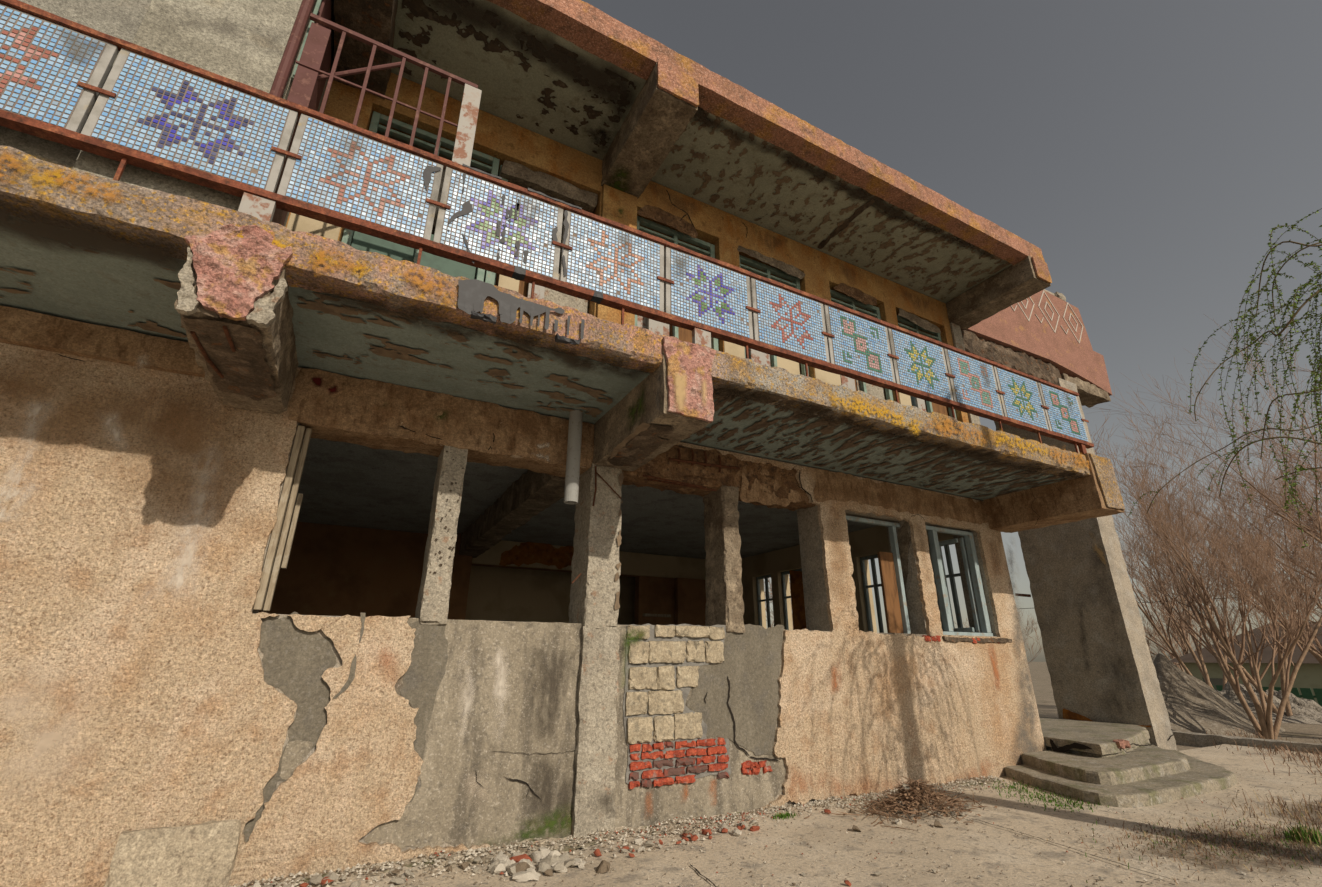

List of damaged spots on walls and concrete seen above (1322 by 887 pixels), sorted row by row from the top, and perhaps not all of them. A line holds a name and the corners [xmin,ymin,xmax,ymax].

peeling [397,0,636,154]
spalling [120,244,613,417]
peeling [592,385,1078,546]
spalling [499,542,581,584]
spalling [897,521,910,621]
peeling [244,612,337,843]
peeling [360,618,582,850]
leakage [522,765,572,839]
leakage [539,658,563,729]
peeling [614,562,818,828]
crack [704,677,780,762]